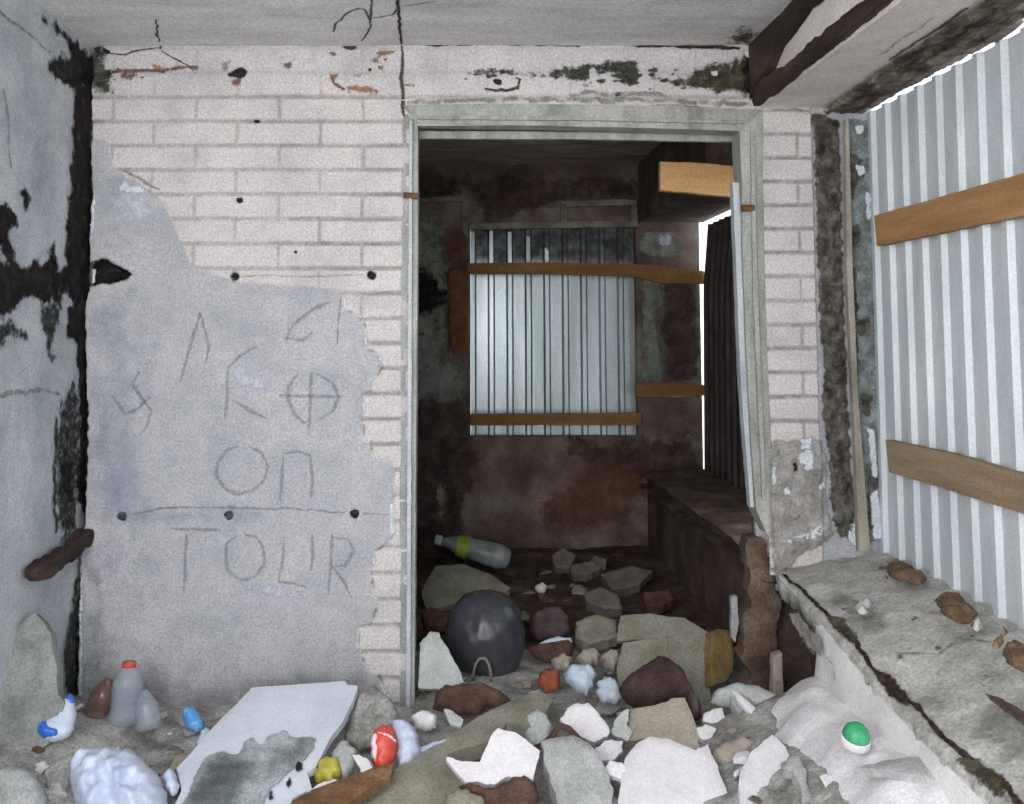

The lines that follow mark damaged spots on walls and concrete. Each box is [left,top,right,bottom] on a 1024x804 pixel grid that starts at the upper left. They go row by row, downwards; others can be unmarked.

rust [107,64,198,80]
spalling [223,61,247,85]
rust [330,74,379,94]
rust [368,51,394,71]
crack [333,0,472,117]
water stain [465,51,753,106]
crack [636,43,740,51]
spalling [90,259,132,285]
spalling [770,0,1024,574]
water stain [53,417,83,533]
flaking render [359,502,401,703]
crack [782,574,1024,804]